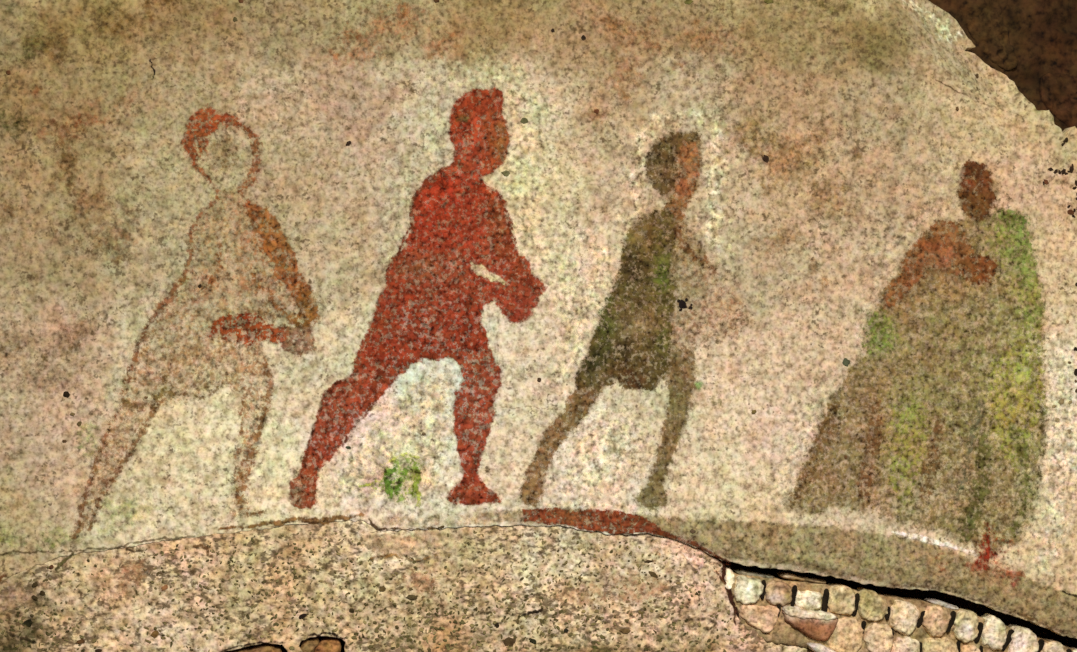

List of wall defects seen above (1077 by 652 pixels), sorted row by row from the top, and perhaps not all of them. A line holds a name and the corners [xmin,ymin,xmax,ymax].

flaking render [929,0,1077,146]
leakage [347,382,442,501]
crack [0,513,438,582]
crack [697,560,740,629]
flaking render [683,548,1077,652]
crack [7,631,36,643]
flaking render [225,643,287,652]
crack [223,632,347,651]
flaking render [299,636,345,652]